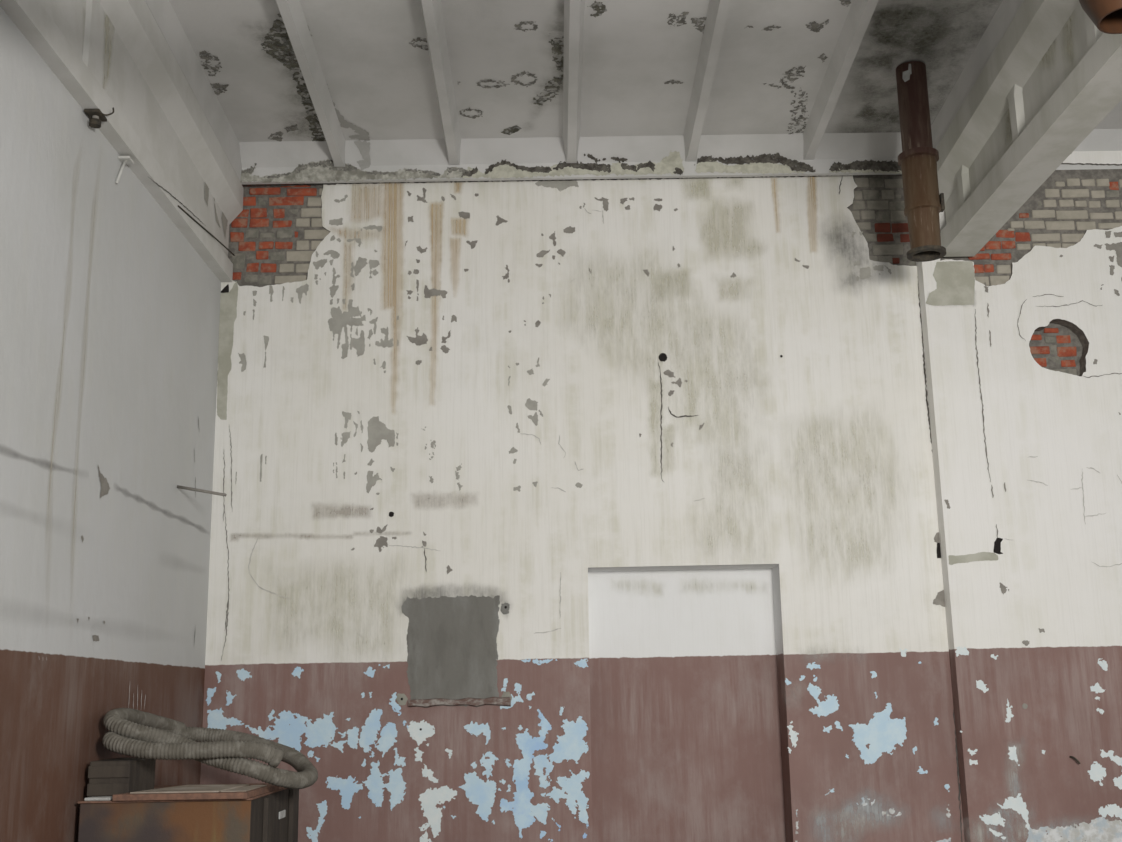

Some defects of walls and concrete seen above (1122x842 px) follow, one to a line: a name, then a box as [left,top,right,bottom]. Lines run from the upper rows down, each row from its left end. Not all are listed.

leakage [261,14,325,141]
leakage [806,19,829,32]
leakage [872,5,973,80]
flaking render [205,183,457,420]
corrosion [359,182,401,311]
flaking render [848,174,916,281]
flaking render [926,169,1122,306]
spalling [1029,323,1098,376]
flaking render [206,595,590,842]
peeling [785,662,928,774]
peeling [979,793,1030,840]
peeling [1087,749,1122,790]